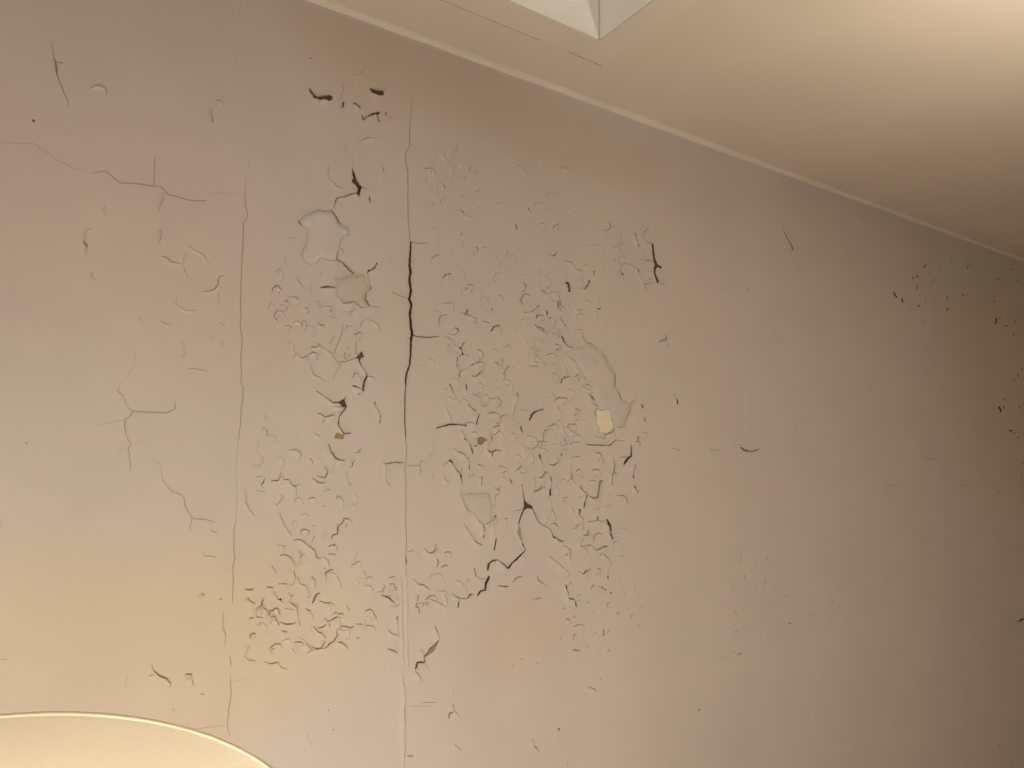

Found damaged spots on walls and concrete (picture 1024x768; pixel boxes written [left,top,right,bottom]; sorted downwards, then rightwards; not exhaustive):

crack [52,47,107,106]
peeling [307,67,395,145]
crack [5,119,249,736]
peeling [268,257,392,370]
peeling [239,413,471,672]
crack [292,100,439,768]
peeling [427,229,667,662]